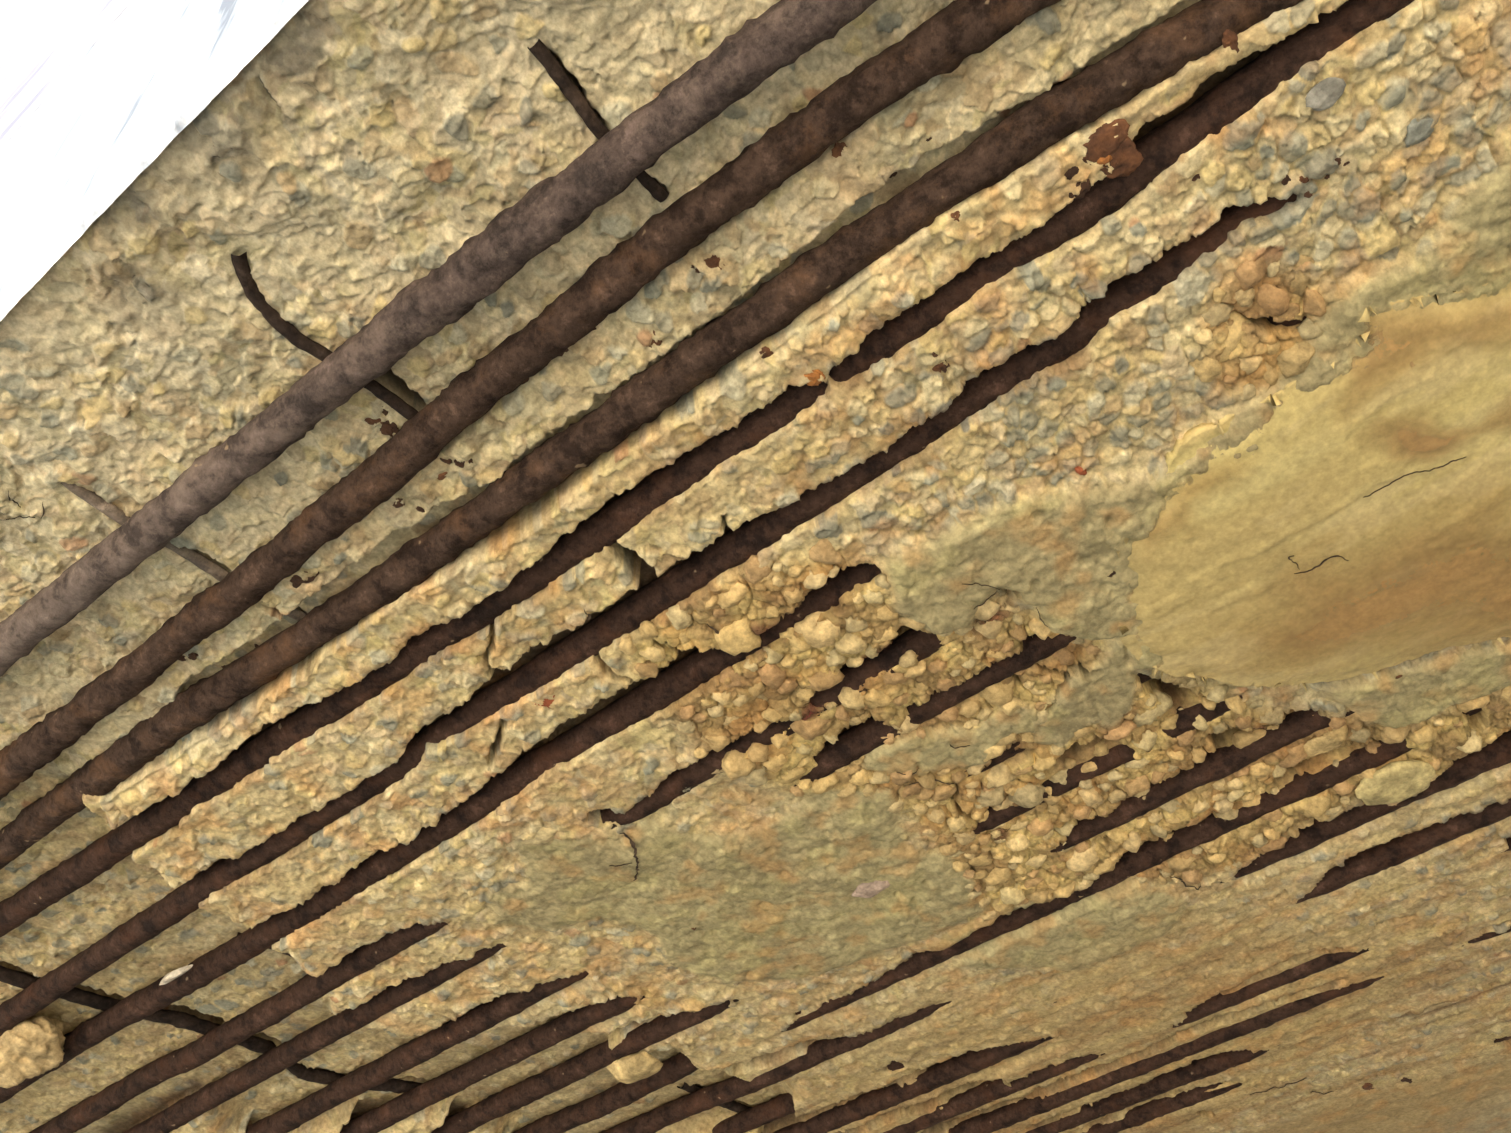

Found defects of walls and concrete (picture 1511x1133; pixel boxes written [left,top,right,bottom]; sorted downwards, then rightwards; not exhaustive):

rust [1222,29,1239,53]
rust [1064,119,1144,199]
rust [1281,158,1350,198]
rust [691,255,725,273]
rust [759,346,774,359]
rust [932,352,950,373]
rust [364,406,399,437]
spalling [0,0,1511,902]
rust [437,458,473,480]
rust [290,571,319,588]
spalling [76,633,649,1000]
spalling [0,709,1511,1133]